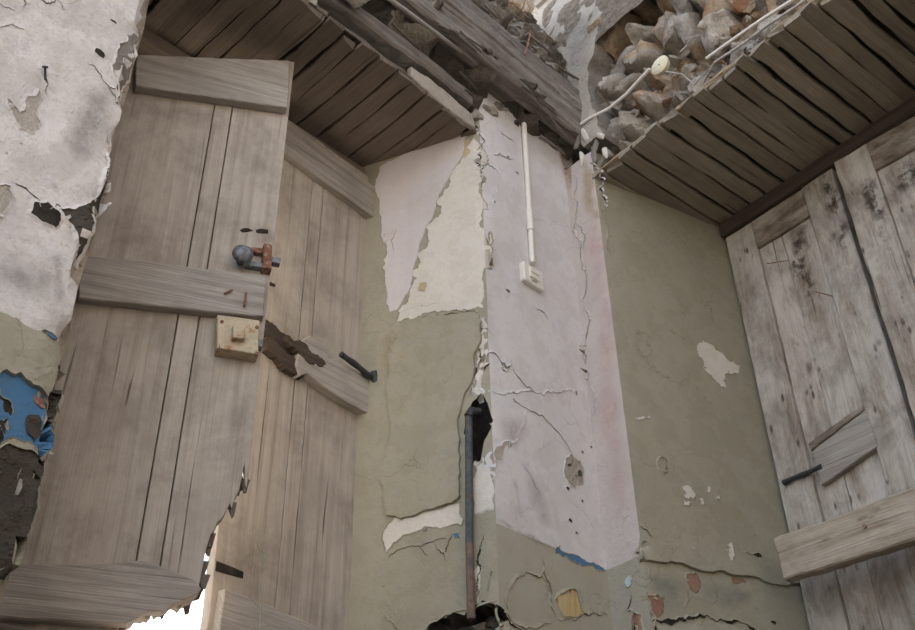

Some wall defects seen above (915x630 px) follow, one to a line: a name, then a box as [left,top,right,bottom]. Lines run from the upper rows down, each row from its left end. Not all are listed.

crack [0,0,65,29]
peeling [5,88,43,135]
crack [88,62,117,99]
flaking render [109,32,139,107]
flaking render [58,125,115,270]
peeling [395,138,494,404]
crack [407,161,611,492]
peeling [695,341,740,389]
flaking render [0,365,66,585]
flaking render [562,453,584,490]
peeling [554,546,605,572]
crack [540,558,756,630]